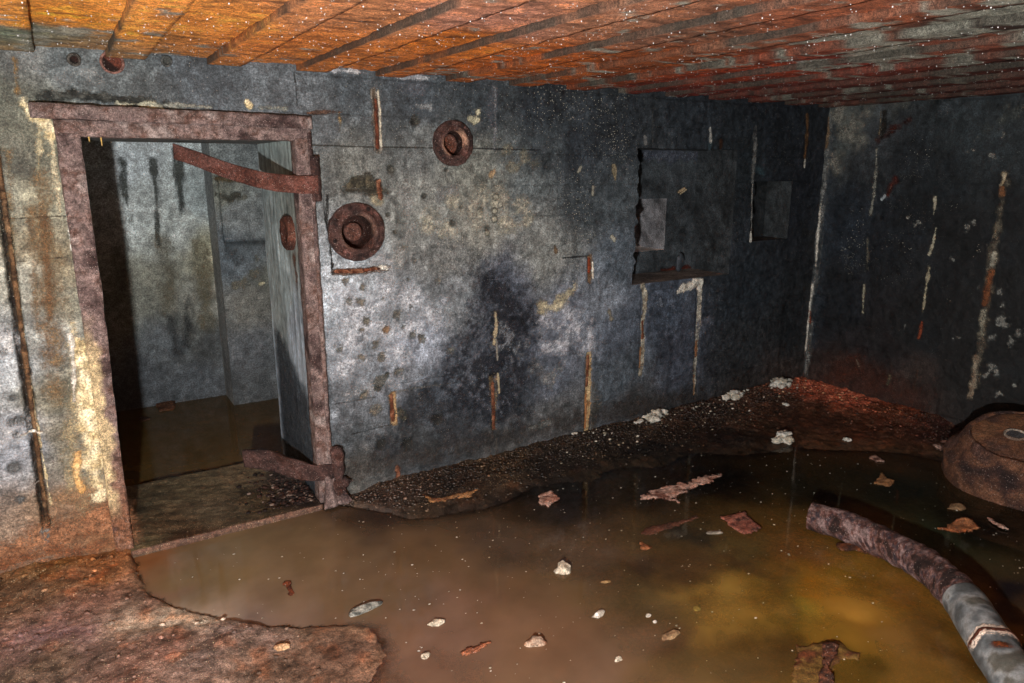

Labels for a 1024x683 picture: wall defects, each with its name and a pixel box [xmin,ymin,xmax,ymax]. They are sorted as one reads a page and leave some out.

rust [0,150,114,572]
water stain [343,387,702,478]
efflorescence [530,283,595,388]
rust [584,352,600,431]
water stain [804,101,910,374]
efflorescence [917,228,936,339]
rust [967,172,1010,399]